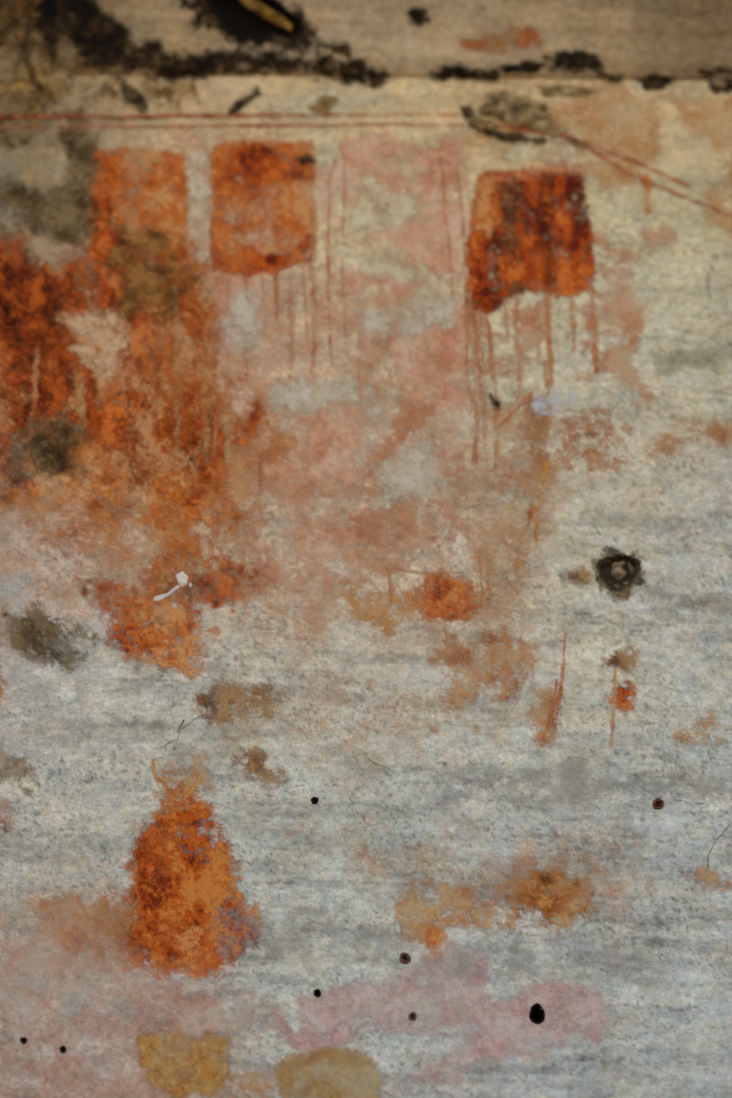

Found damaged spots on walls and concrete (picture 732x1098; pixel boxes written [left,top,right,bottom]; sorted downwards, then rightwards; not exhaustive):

leakage [407,6,431,26]
leakage [430,48,623,84]
leakage [637,73,676,91]
leakage [697,67,732,94]
leakage [0,0,390,413]
corrosion [0,140,318,680]
corrosion [341,160,632,716]
leakage [4,602,97,671]
corrosion [529,634,566,746]
corrosion [605,646,639,746]
corrosion [109,756,263,980]
corrosion [396,858,622,959]